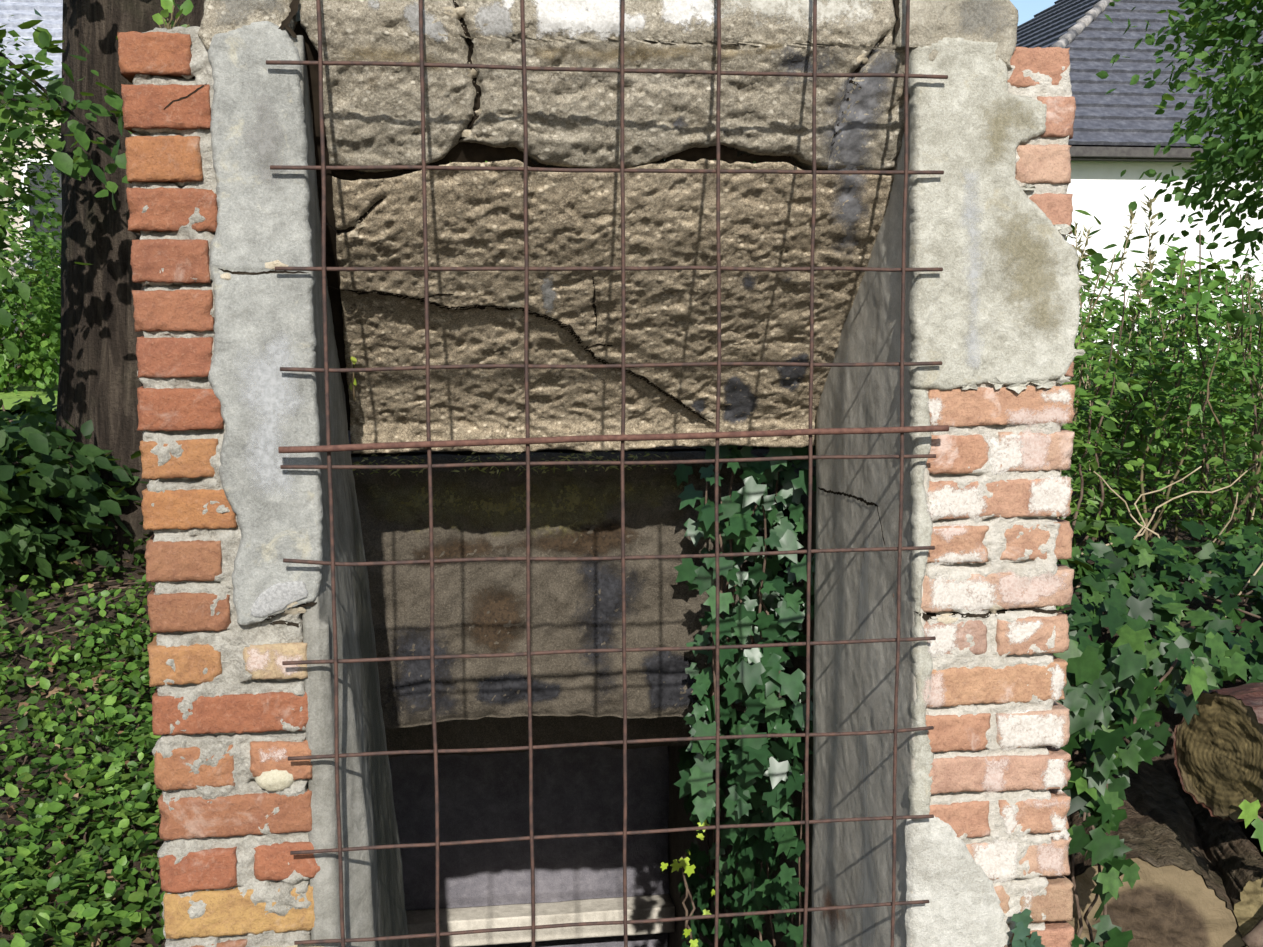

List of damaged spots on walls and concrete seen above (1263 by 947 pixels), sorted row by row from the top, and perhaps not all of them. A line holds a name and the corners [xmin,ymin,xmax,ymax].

crack [635,0,900,169]
crack [218,0,715,430]
peeling [960,375,1071,515]
spalling [251,581,308,617]
leakage [387,628,455,718]
leakage [477,673,560,705]
leakage [518,521,639,692]
leakage [643,651,700,710]
crack [818,487,885,544]
peeling [921,624,958,657]
peeling [927,485,1067,614]
peeling [983,664,1070,875]